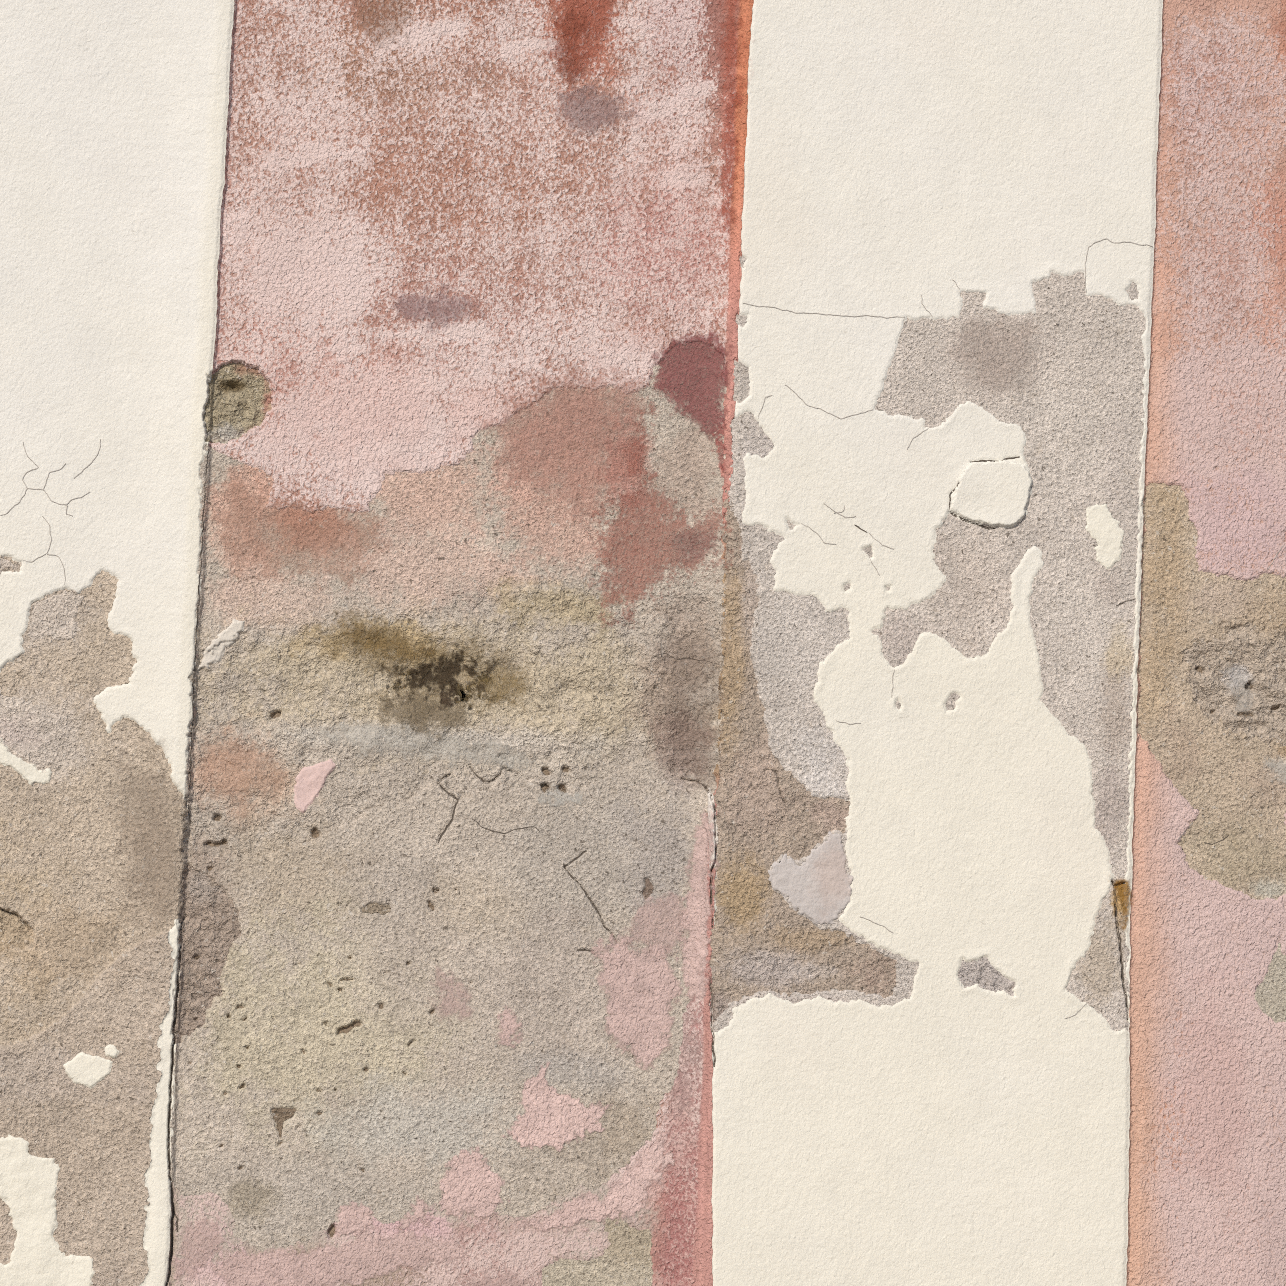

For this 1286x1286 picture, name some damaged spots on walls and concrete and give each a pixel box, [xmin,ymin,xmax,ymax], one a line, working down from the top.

crack [0,439,101,585]
damp [314,649,529,769]
peeling [871,272,1286,1032]
peeling [0,344,919,1286]
crack [437,767,539,843]
crack [564,851,617,955]
rust [1114,880,1131,928]
crack [166,918,184,1286]